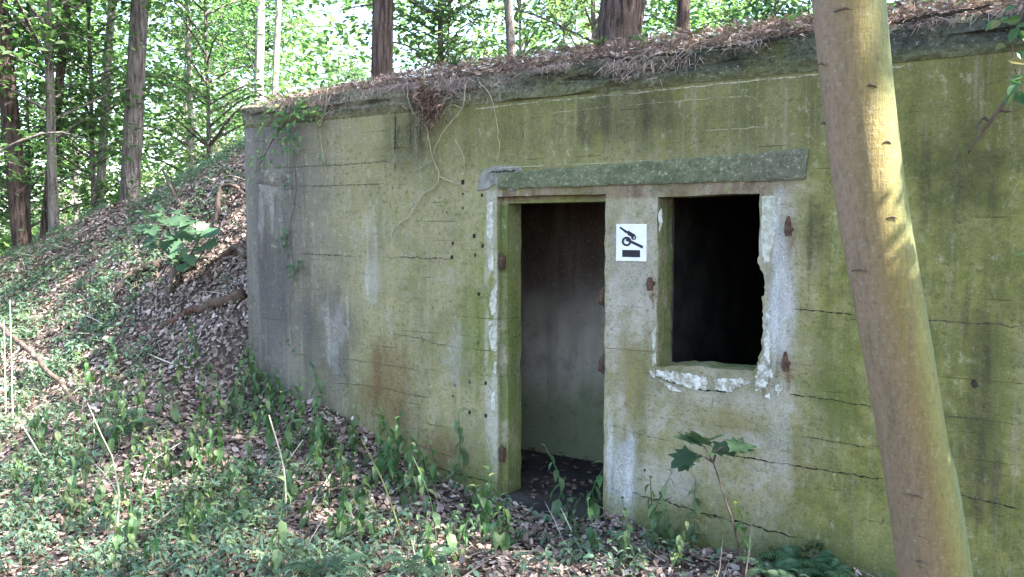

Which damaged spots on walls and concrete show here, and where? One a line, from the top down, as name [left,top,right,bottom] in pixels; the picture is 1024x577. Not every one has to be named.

peeling [649,196,786,400]
crack [790,394,870,407]
crack [736,455,883,479]
crack [607,487,798,539]